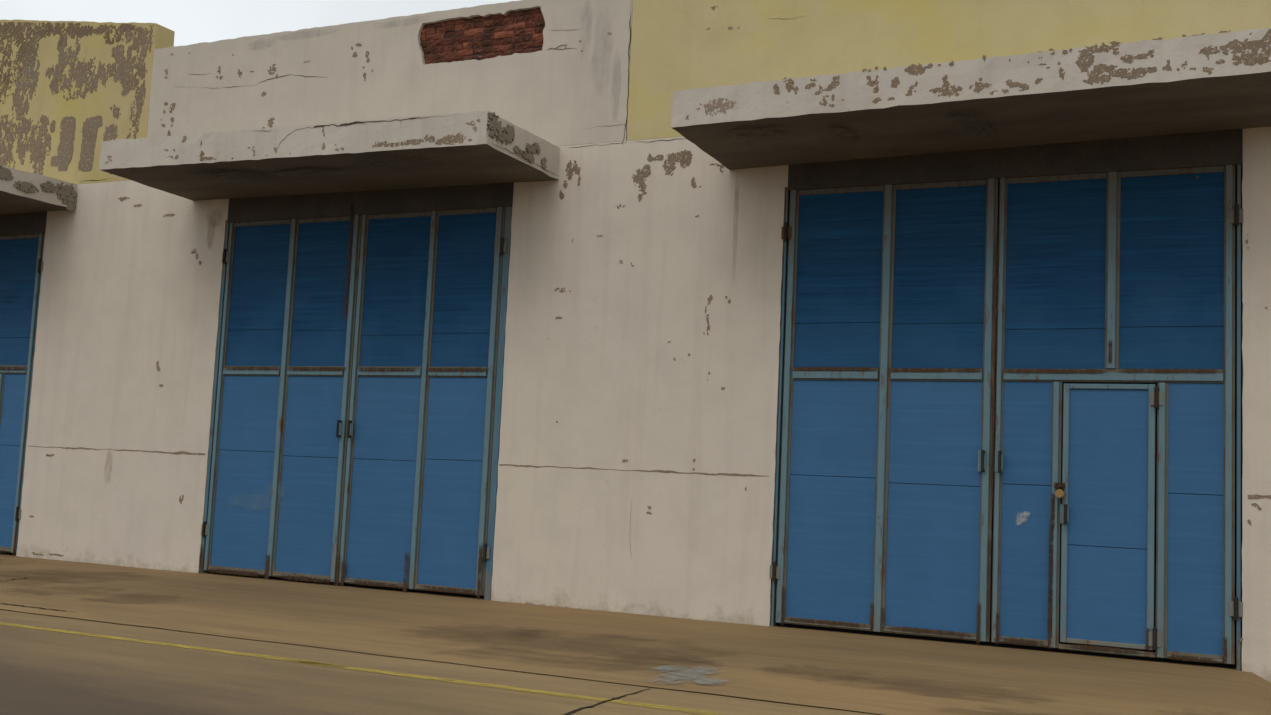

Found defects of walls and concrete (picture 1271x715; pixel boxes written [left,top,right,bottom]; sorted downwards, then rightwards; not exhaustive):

flaking render [420,8,545,64]
peeling [0,22,154,211]
crack [252,115,450,153]
peeling [372,112,547,169]
peeling [773,75,844,107]
peeling [862,29,1271,103]
peeling [559,160,581,200]
peeling [617,149,701,209]
crack [563,688,651,715]